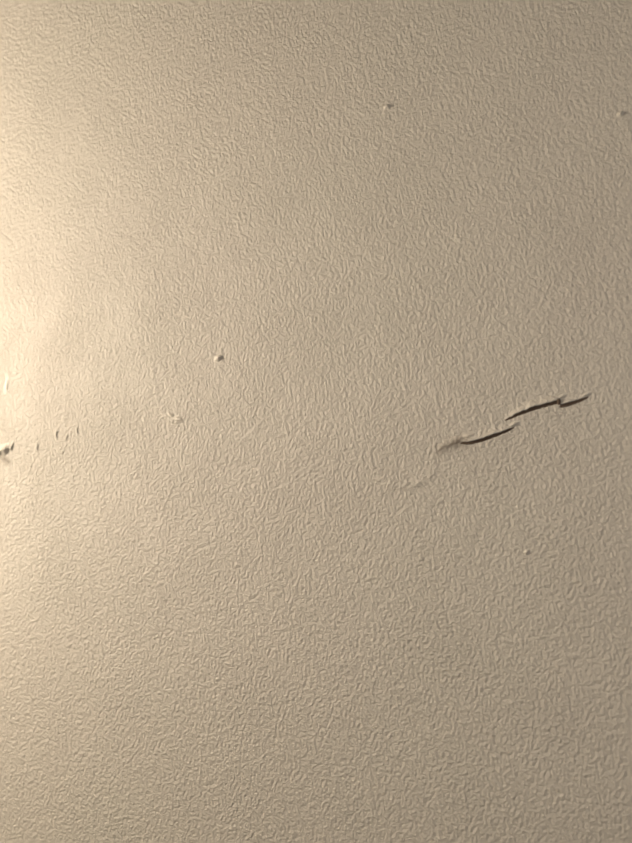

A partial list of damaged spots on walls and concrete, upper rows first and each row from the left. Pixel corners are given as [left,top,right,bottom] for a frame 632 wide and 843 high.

crack [434,391,593,452]